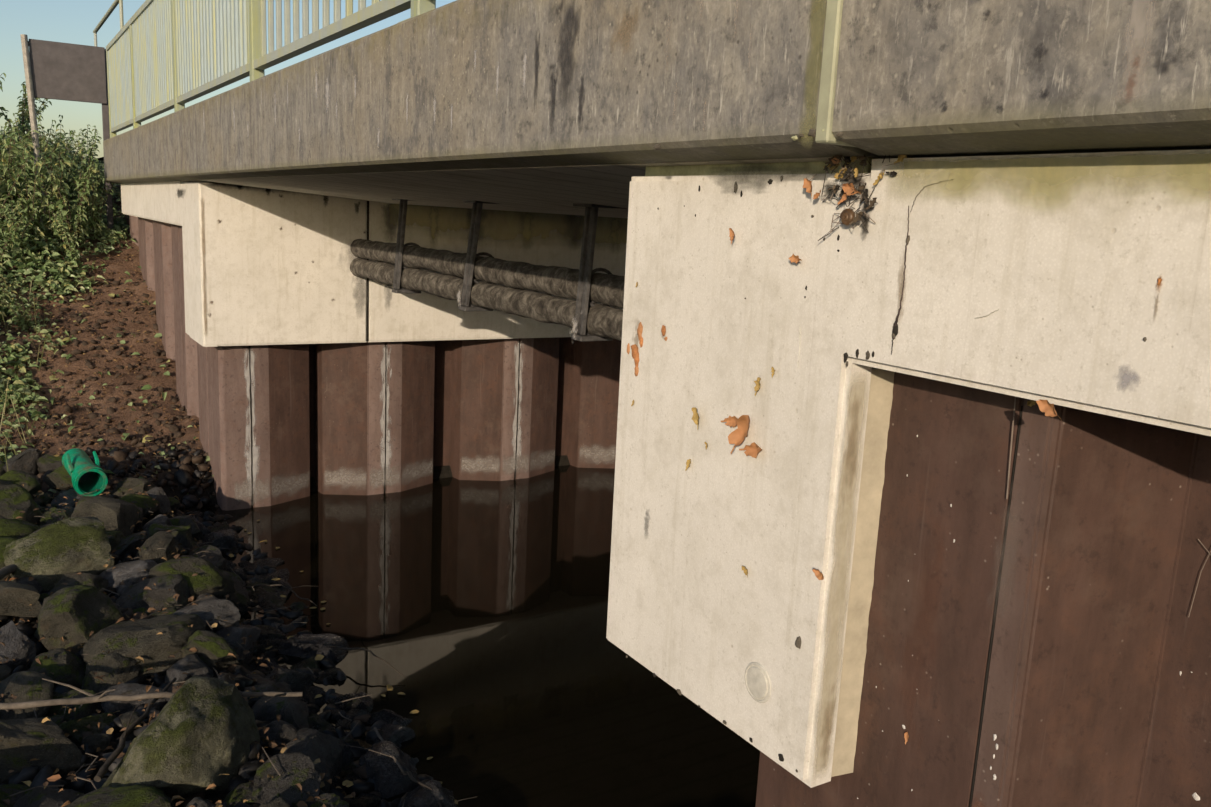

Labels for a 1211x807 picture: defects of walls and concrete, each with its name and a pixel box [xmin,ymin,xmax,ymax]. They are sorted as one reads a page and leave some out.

damp [523,4,583,121]
crack [891,180,948,355]
damp [236,346,307,506]
damp [325,343,432,492]